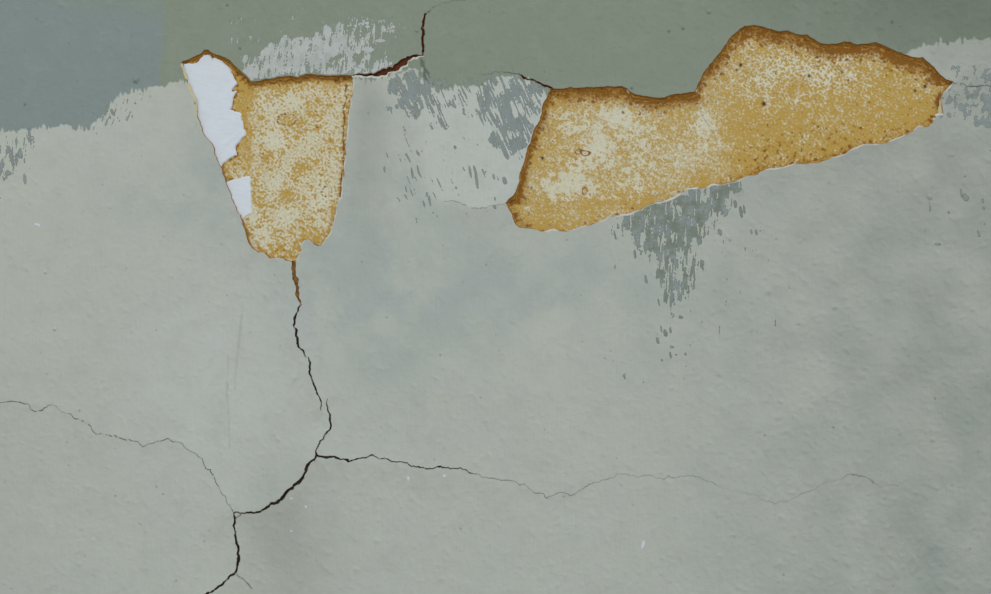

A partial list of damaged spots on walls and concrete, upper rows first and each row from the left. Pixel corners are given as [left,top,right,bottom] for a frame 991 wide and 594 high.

crack [352,0,459,79]
crack [481,71,553,89]
flaking render [181,12,991,361]
crack [0,261,899,594]